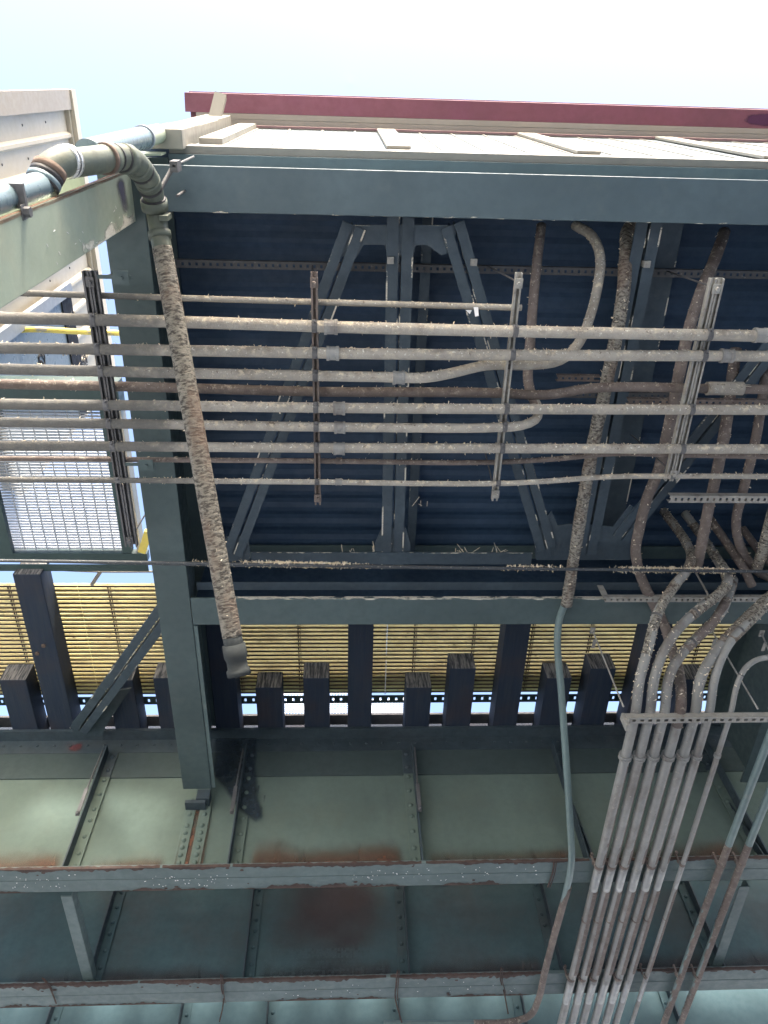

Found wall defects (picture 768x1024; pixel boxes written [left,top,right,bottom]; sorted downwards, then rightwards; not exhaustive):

corrosion [253,849,400,863]
peeling [0,855,768,876]
corrosion [301,887,372,949]
peeling [0,971,541,997]
peeling [265,994,391,1002]